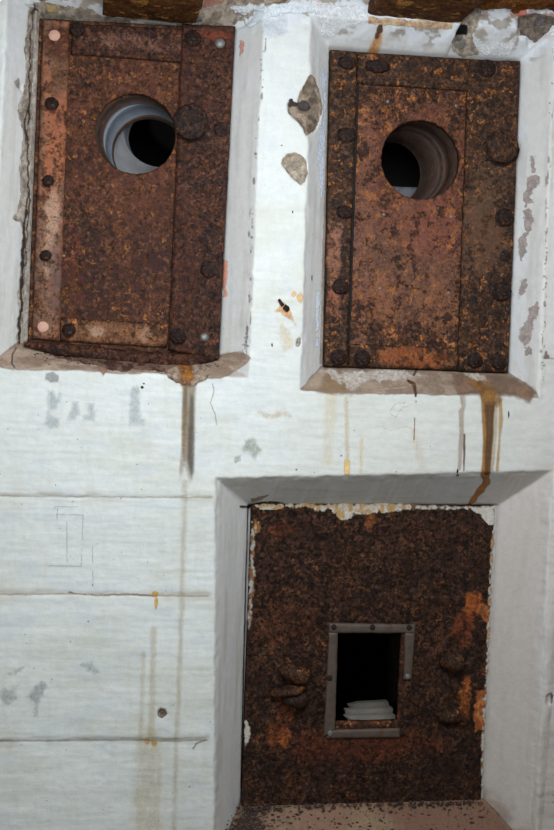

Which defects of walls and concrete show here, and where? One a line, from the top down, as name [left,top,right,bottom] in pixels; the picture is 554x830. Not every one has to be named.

spalling [33,0,554,58]
peeling [518,156,549,259]
peeling [519,301,546,356]
corrosion [24,341,215,471]
corrosion [468,380,503,505]